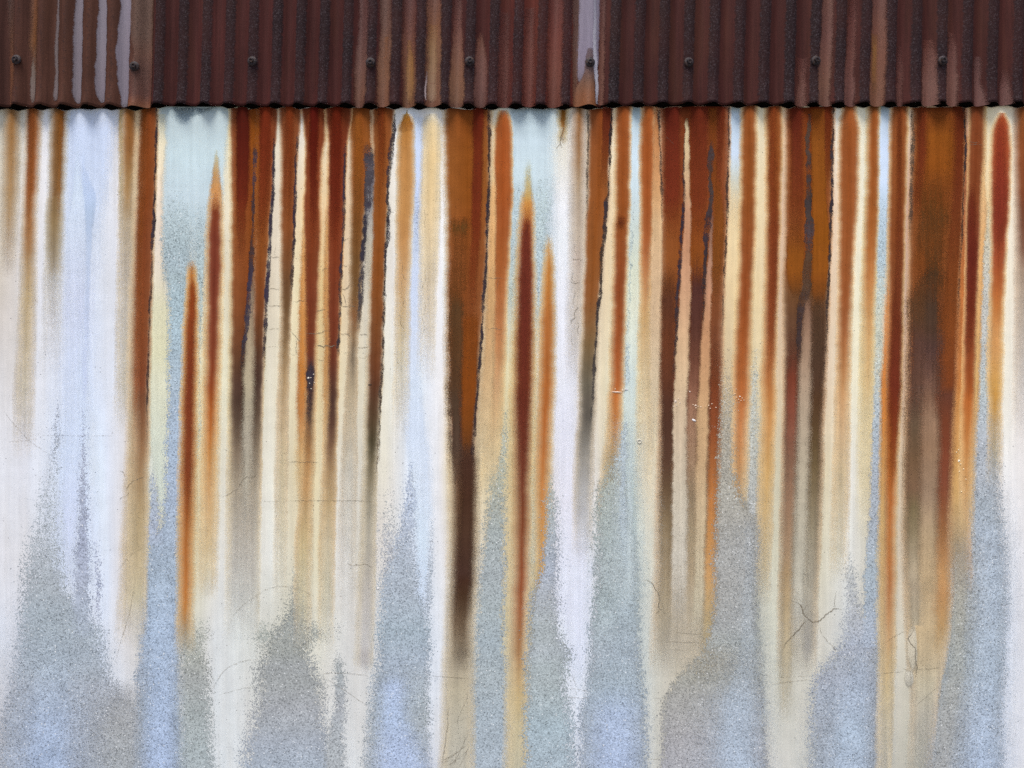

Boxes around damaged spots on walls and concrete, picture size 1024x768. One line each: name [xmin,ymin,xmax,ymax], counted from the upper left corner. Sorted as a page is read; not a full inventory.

corrosion [112,0,160,643]
corrosion [174,0,558,768]
corrosion [545,0,1024,768]
crack [784,600,841,651]